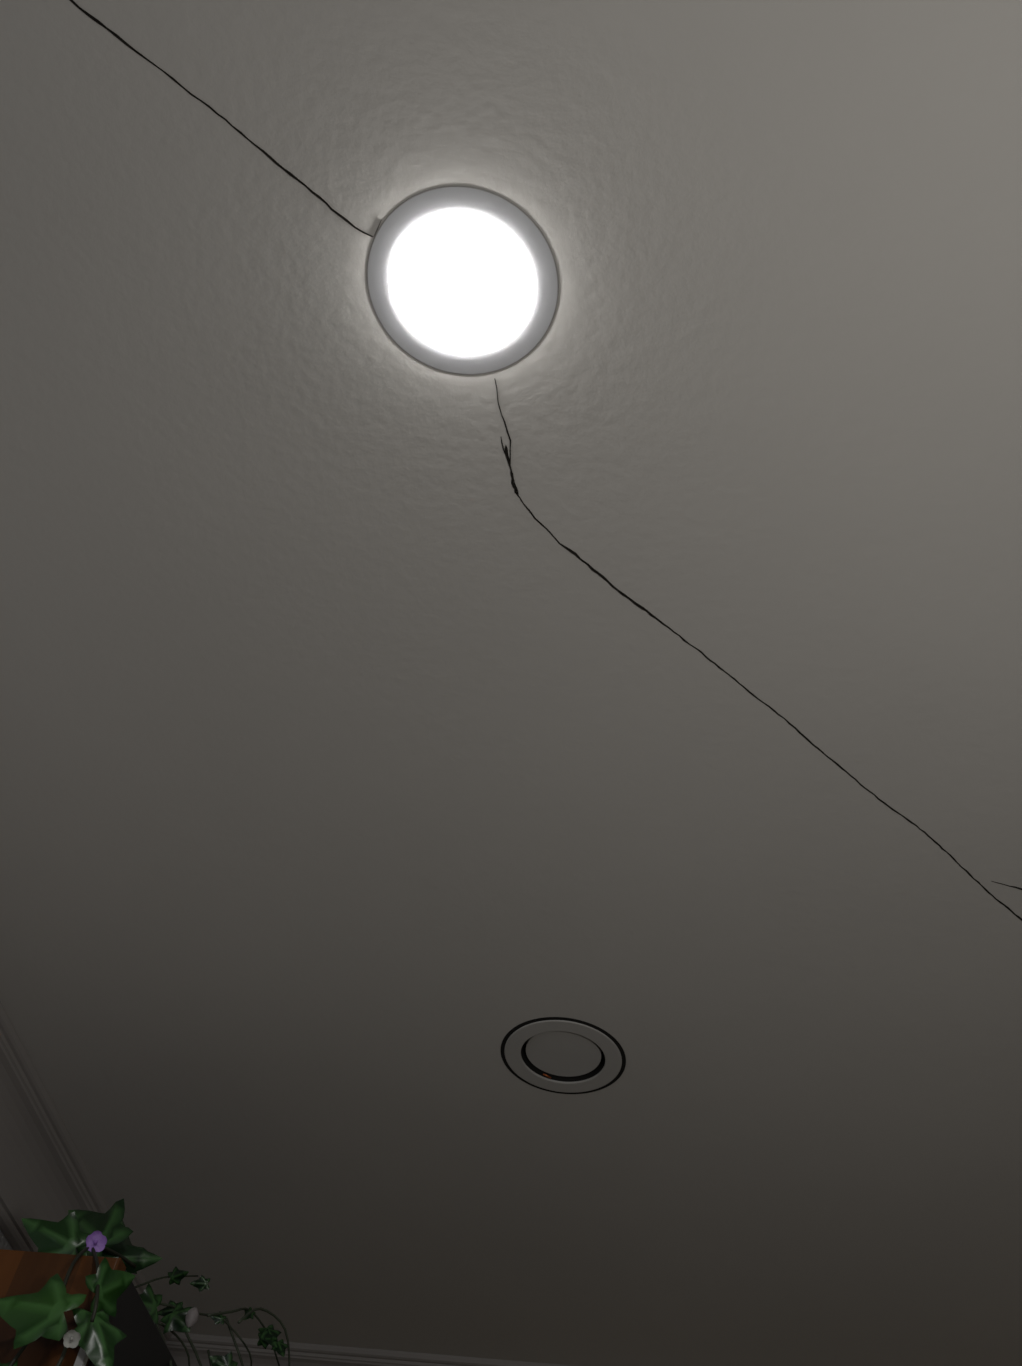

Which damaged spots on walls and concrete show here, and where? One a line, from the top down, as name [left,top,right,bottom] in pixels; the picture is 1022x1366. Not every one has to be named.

crack [70,0,381,237]
crack [494,378,1022,921]